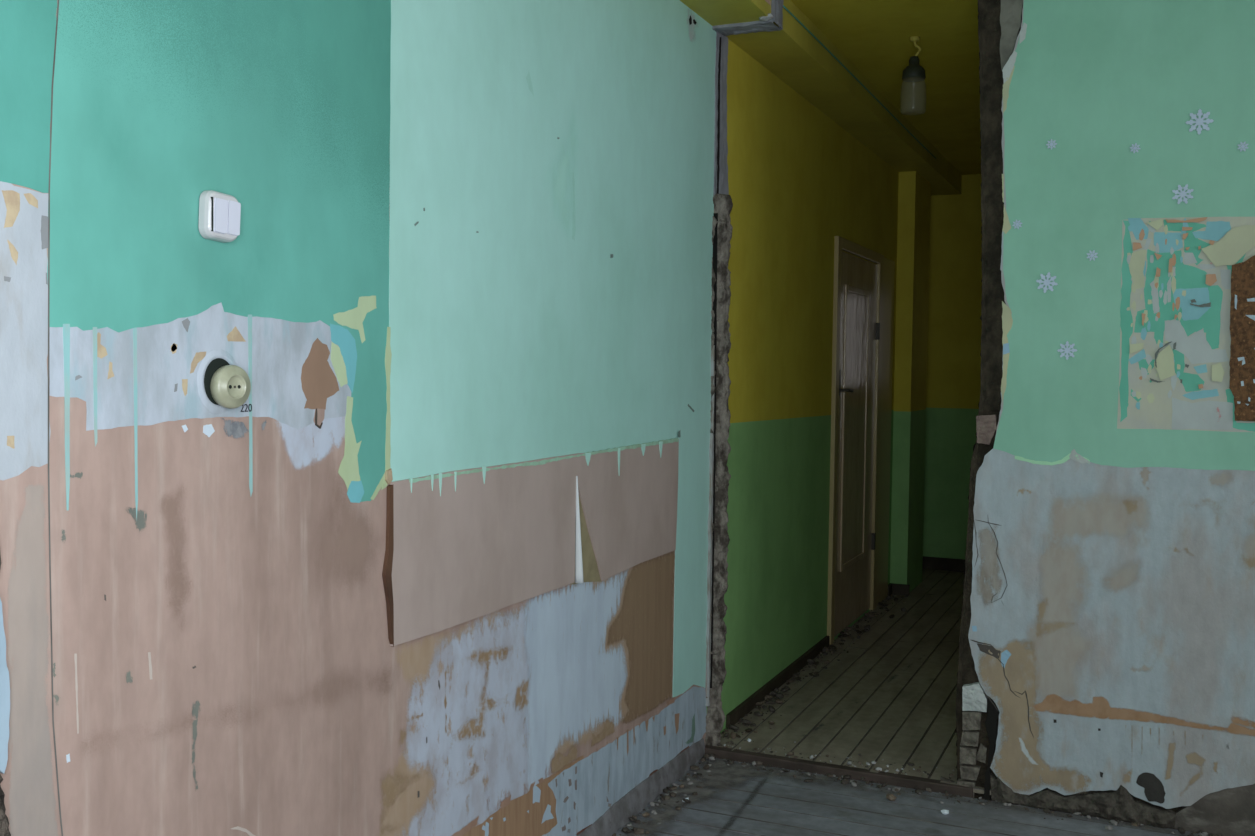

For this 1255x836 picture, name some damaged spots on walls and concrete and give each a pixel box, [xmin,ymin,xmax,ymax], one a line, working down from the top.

spalling [0,599,11,836]
water stain [126,482,194,632]
peeling [0,181,393,503]
spalling [376,0,783,836]
crack [974,520,1007,605]
spalling [940,0,1255,836]